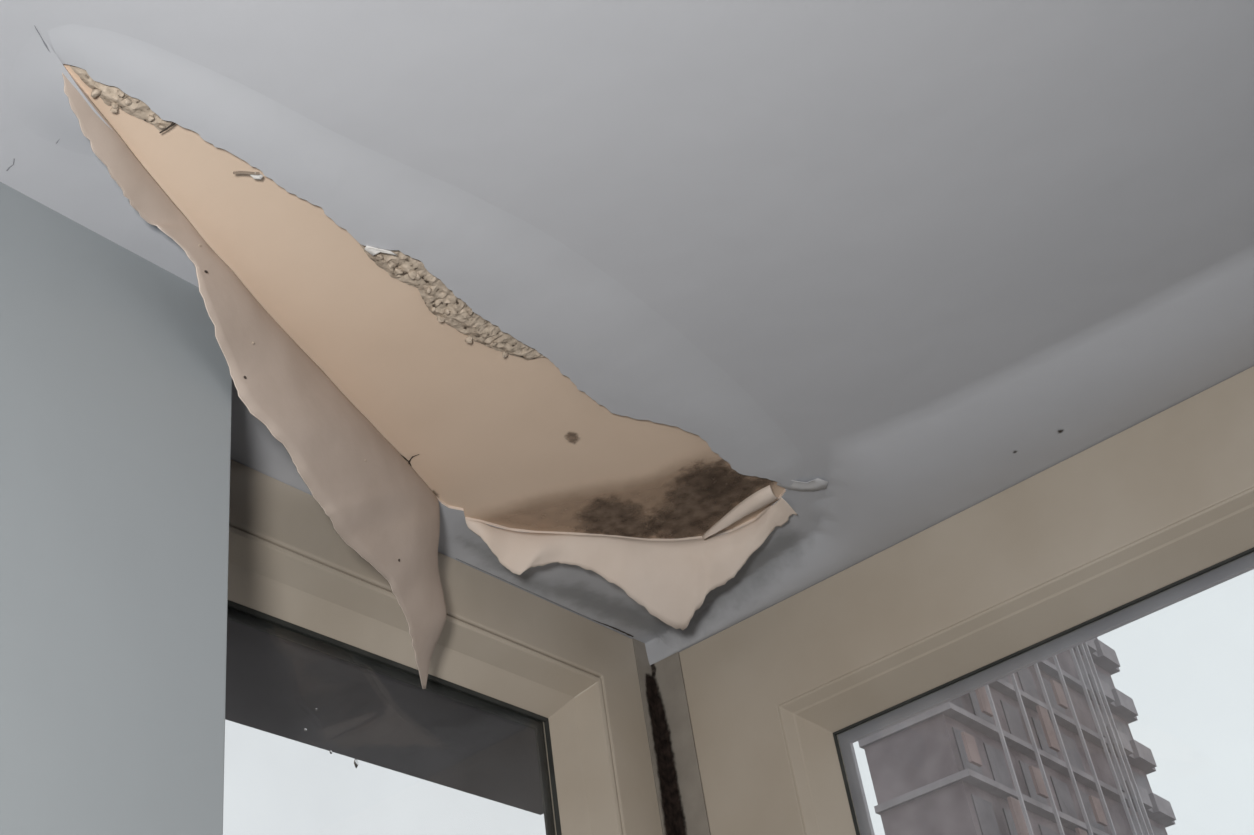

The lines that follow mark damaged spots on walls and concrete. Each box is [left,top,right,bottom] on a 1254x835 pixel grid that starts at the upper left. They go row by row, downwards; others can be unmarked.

peeling [62,64,828,689]
damp [500,461,771,539]